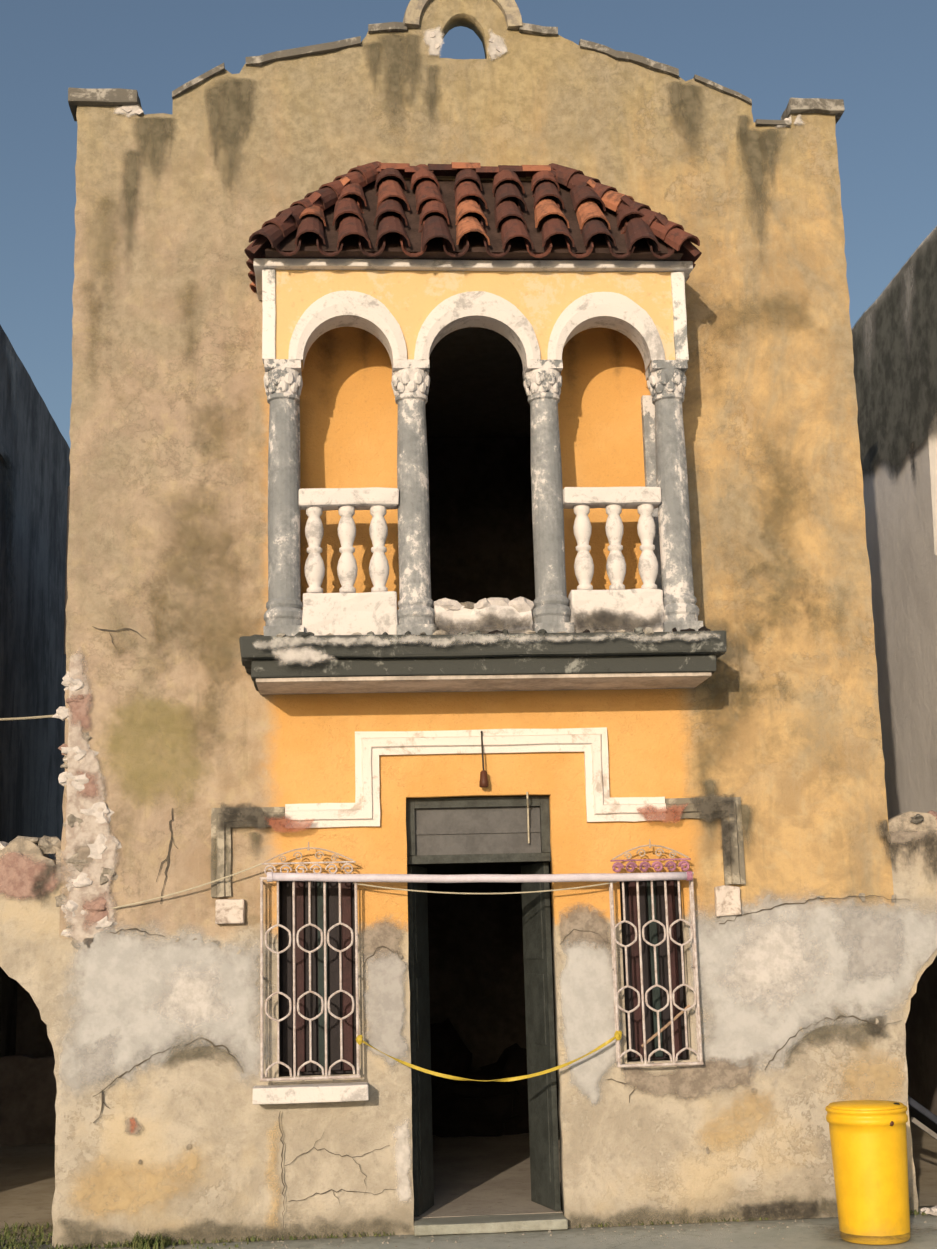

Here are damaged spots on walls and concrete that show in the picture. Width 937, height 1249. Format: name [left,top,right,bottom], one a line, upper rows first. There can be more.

leakage [368,34,438,114]
leakage [124,117,173,228]
leakage [208,79,252,175]
leakage [739,115,779,216]
flaking render [0,652,265,1097]
crack [156,808,178,901]
flaking render [559,893,937,1103]
crack [93,1092,110,1123]
crack [284,1133,398,1203]